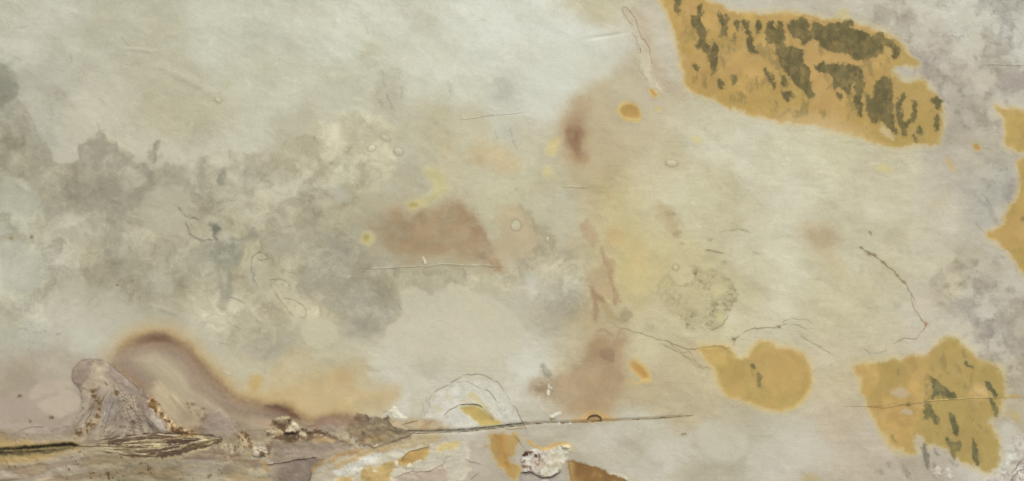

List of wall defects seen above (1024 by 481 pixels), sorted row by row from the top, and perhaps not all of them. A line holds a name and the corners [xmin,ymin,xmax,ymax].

damp [0,60,16,101]
damp [194,155,229,196]
damp [311,91,599,283]
damp [178,206,269,303]
crack [859,230,931,353]
crack [623,317,830,370]
peeling [20,356,524,481]
crack [346,408,692,450]
flaking render [507,448,570,481]
damp [872,442,960,481]